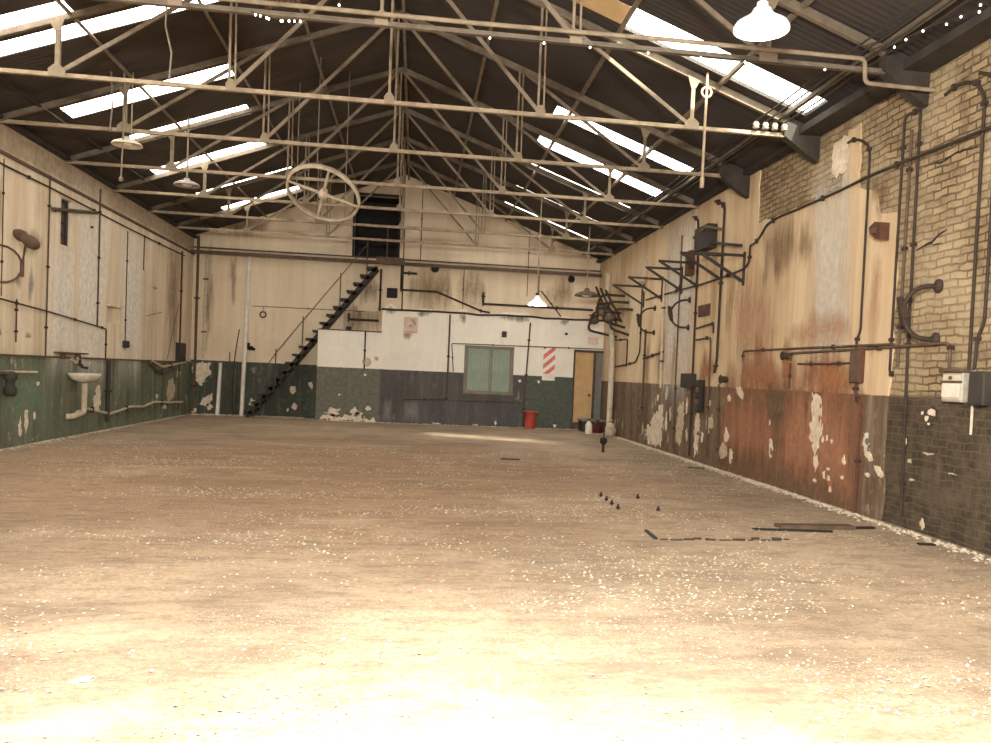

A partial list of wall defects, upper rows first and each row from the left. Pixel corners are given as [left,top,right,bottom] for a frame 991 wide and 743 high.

flaking render [831,135,849,178]
water stain [0,160,8,261]
water stain [152,222,183,394]
peeling [155,360,213,413]
peeling [320,406,376,422]
flaking render [642,386,733,464]
rust [721,296,864,509]
peeling [809,393,846,492]
peeling [862,431,884,478]
spalling [921,406,939,425]